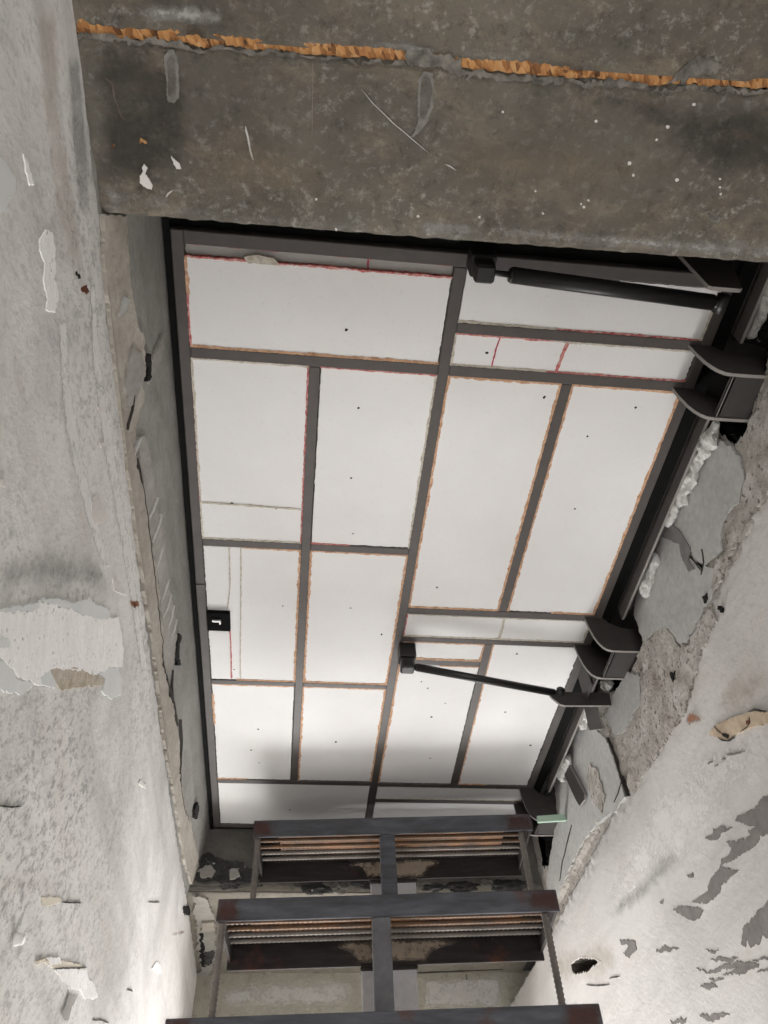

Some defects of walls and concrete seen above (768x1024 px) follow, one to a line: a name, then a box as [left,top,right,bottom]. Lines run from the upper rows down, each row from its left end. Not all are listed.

peeling [39,229,59,313]
spalling [627,388,768,792]
flaking render [0,597,124,699]
peeling [660,795,768,921]
peeling [35,957,98,1000]
peeling [620,939,637,958]
peeling [699,1012,730,1023]
peeling [697,900,768,990]